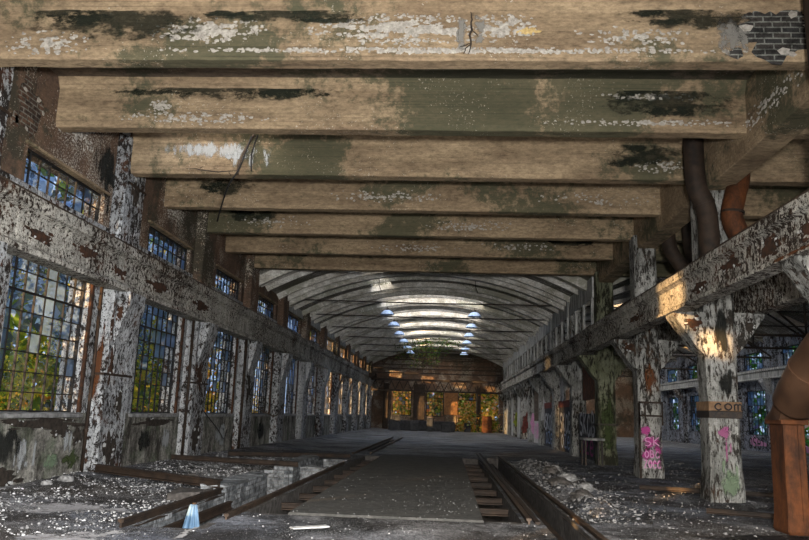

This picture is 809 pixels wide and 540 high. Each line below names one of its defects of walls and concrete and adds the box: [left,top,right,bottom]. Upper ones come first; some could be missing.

leakage [5,9,749,56]
crack [460,12,478,54]
spalling [729,10,807,65]
leakage [116,87,331,125]
leakage [544,90,732,127]
leakage [743,70,803,130]
leakage [610,145,684,174]
peeling [25,225,54,247]
peeling [72,243,98,263]
peeling [684,314,703,331]
peeling [107,302,124,385]
spalling [0,467,24,487]